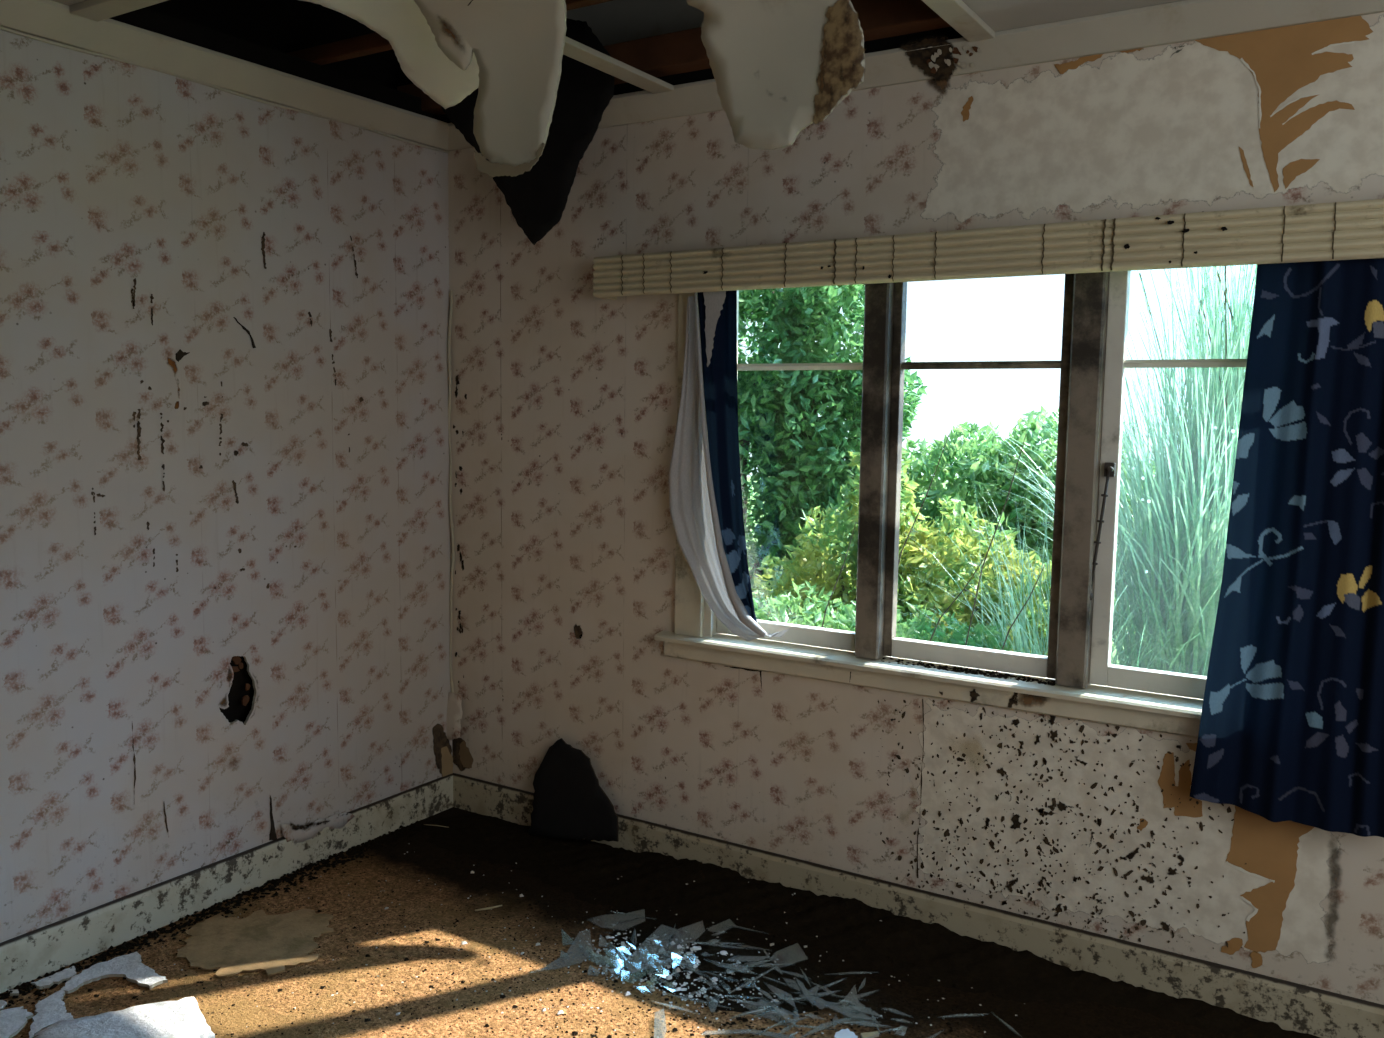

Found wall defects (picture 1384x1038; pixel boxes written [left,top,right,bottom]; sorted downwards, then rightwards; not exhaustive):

peeling [900,36,982,94]
peeling [1283,159,1320,189]
spalling [220,656,258,706]
leakage [290,819,329,830]
leakage [878,689,1234,943]